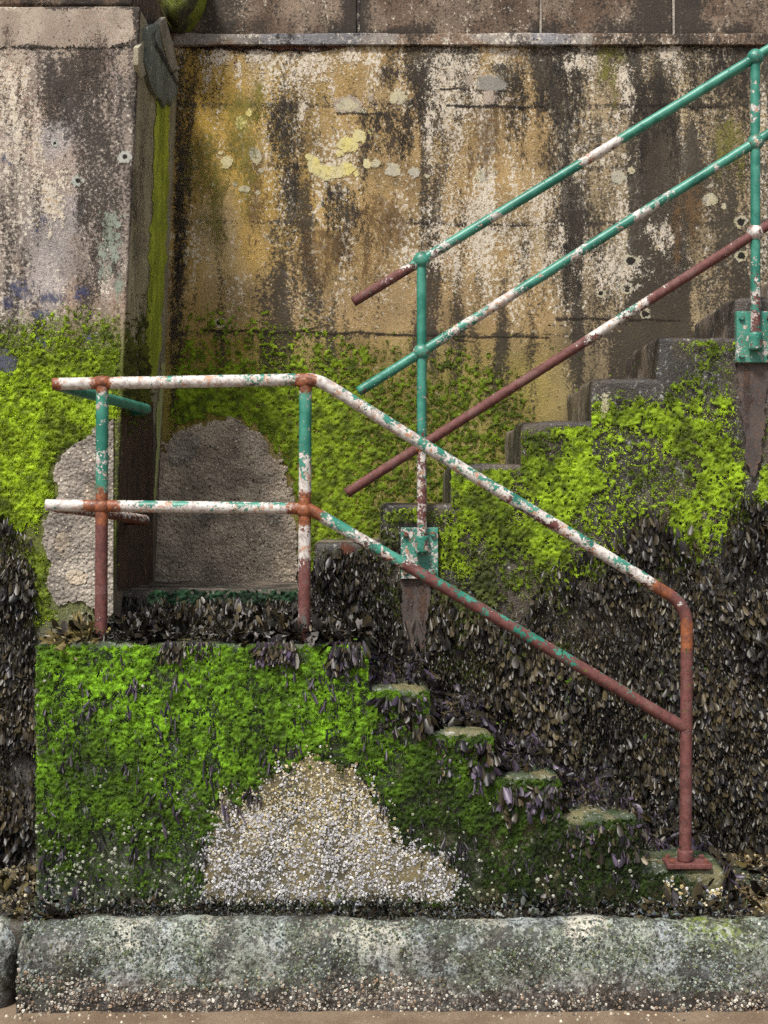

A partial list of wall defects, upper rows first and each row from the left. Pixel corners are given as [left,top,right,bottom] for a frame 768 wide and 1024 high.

leakage [0,23,367,438]
leakage [291,45,750,308]
peeling [41,511,113,617]
peeling [53,419,113,500]
peeling [155,416,298,582]